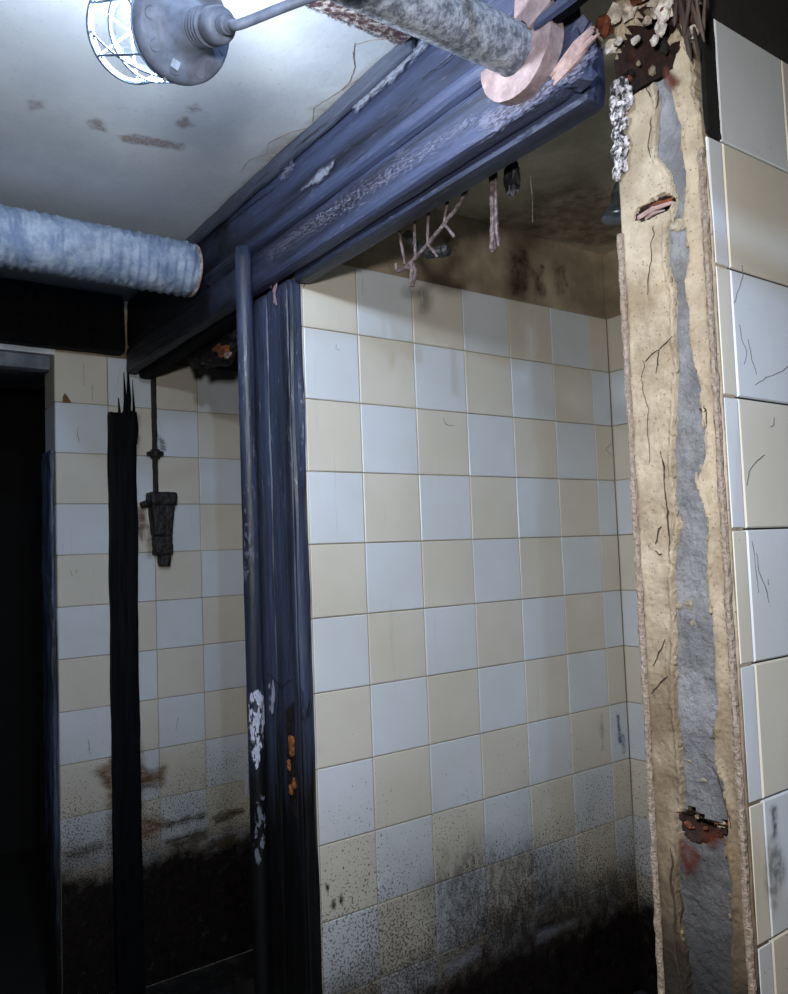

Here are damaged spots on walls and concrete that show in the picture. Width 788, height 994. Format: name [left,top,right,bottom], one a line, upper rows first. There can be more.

spalling [268,0,722,259]
crack [739,325,788,383]
crack [641,336,672,556]
spalling [609,60,733,994]
peeling [244,681,275,798]
water stain [166,809,244,828]
water stain [61,872,116,994]
water stain [143,831,254,994]
water stain [412,880,658,994]